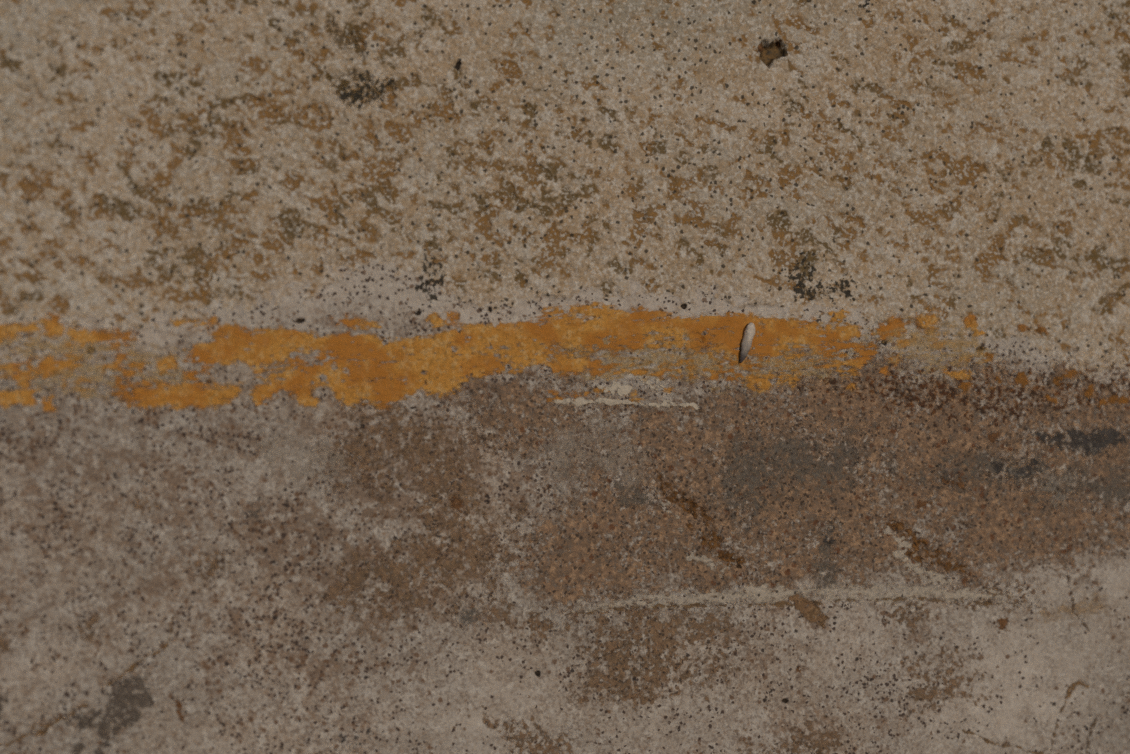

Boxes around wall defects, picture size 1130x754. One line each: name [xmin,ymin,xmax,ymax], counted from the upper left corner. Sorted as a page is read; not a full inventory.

peeling [0,302,993,412]
water stain [315,349,1130,717]